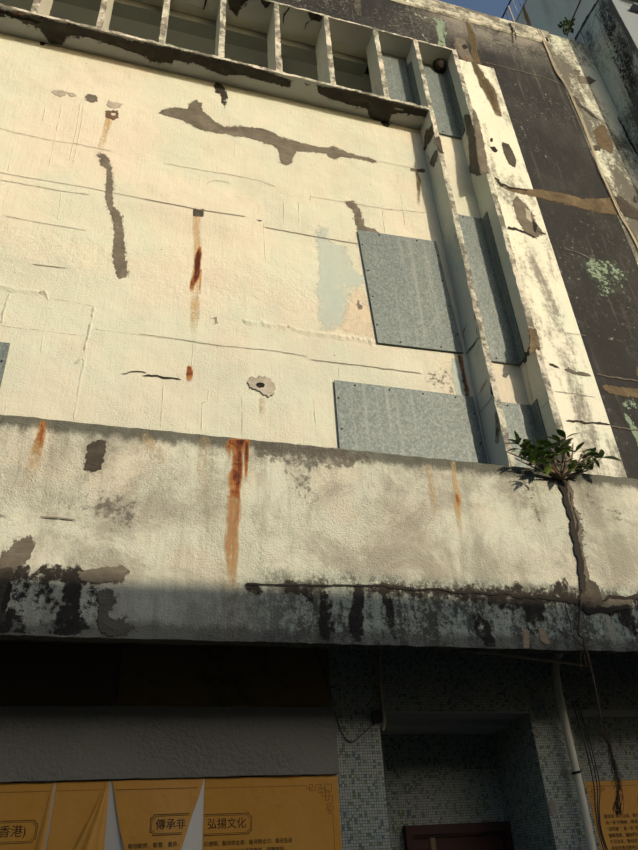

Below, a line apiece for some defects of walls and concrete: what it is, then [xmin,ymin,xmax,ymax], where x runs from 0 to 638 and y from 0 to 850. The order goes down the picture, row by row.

spalling [228,0,248,17]
spalling [105,100,122,120]
flaking render [512,196,544,239]
corrosion [190,216,202,321]
spalling [247,376,275,398]
corrosion [34,421,46,455]
corrosion [225,439,250,574]
crack [246,479,638,615]
mould [0,563,99,635]
leakage [245,584,263,595]
leakage [283,580,335,641]
leakage [348,577,577,647]